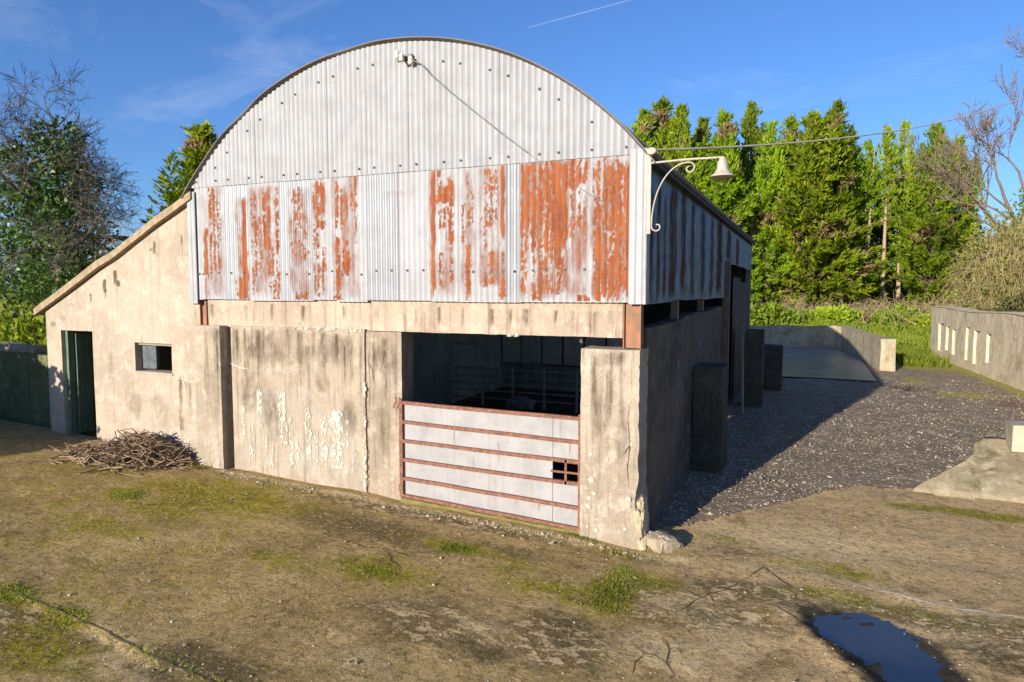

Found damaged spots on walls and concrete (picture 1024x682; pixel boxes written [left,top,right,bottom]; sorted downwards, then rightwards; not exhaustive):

corrosion [203,187,222,298]
corrosion [235,176,358,300]
corrosion [430,165,506,300]
corrosion [520,156,630,301]